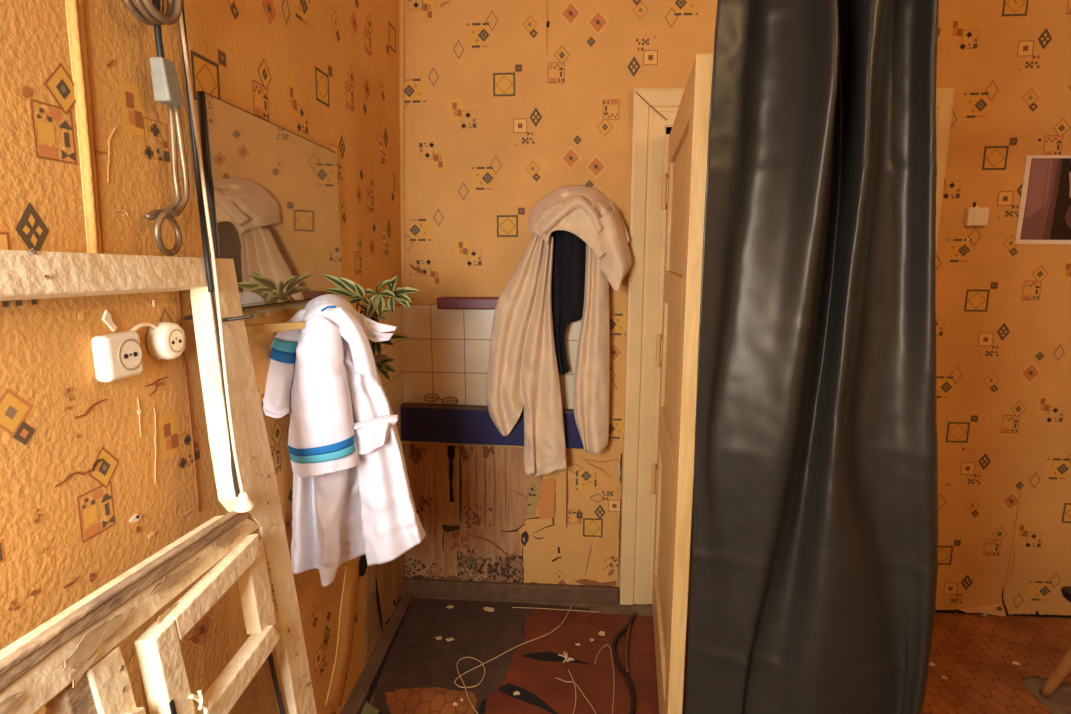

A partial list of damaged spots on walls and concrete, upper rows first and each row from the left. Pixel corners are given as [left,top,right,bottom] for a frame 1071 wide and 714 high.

crack [74,399,106,419]
crack [54,459,104,487]
damp [405,537,537,583]